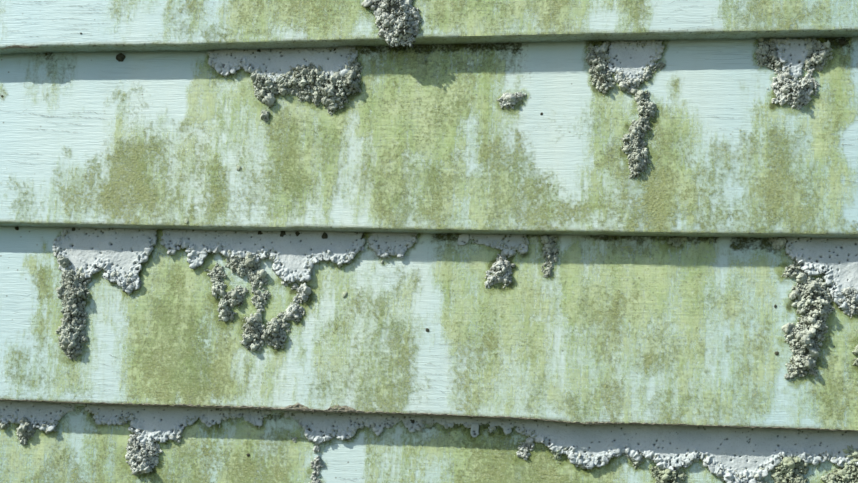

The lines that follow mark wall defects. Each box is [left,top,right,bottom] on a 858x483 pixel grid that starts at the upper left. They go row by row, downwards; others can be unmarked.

water stain [57,128,184,225]
peeling [207,46,363,126]
water stain [358,43,718,257]
peeling [585,40,667,179]
water stain [714,126,825,253]
peeling [753,37,833,113]
water stain [129,266,235,406]
peeling [52,227,421,363]
water stain [345,294,416,413]
peeling [769,237,858,387]
water stain [150,435,291,483]
peeling [0,399,858,483]